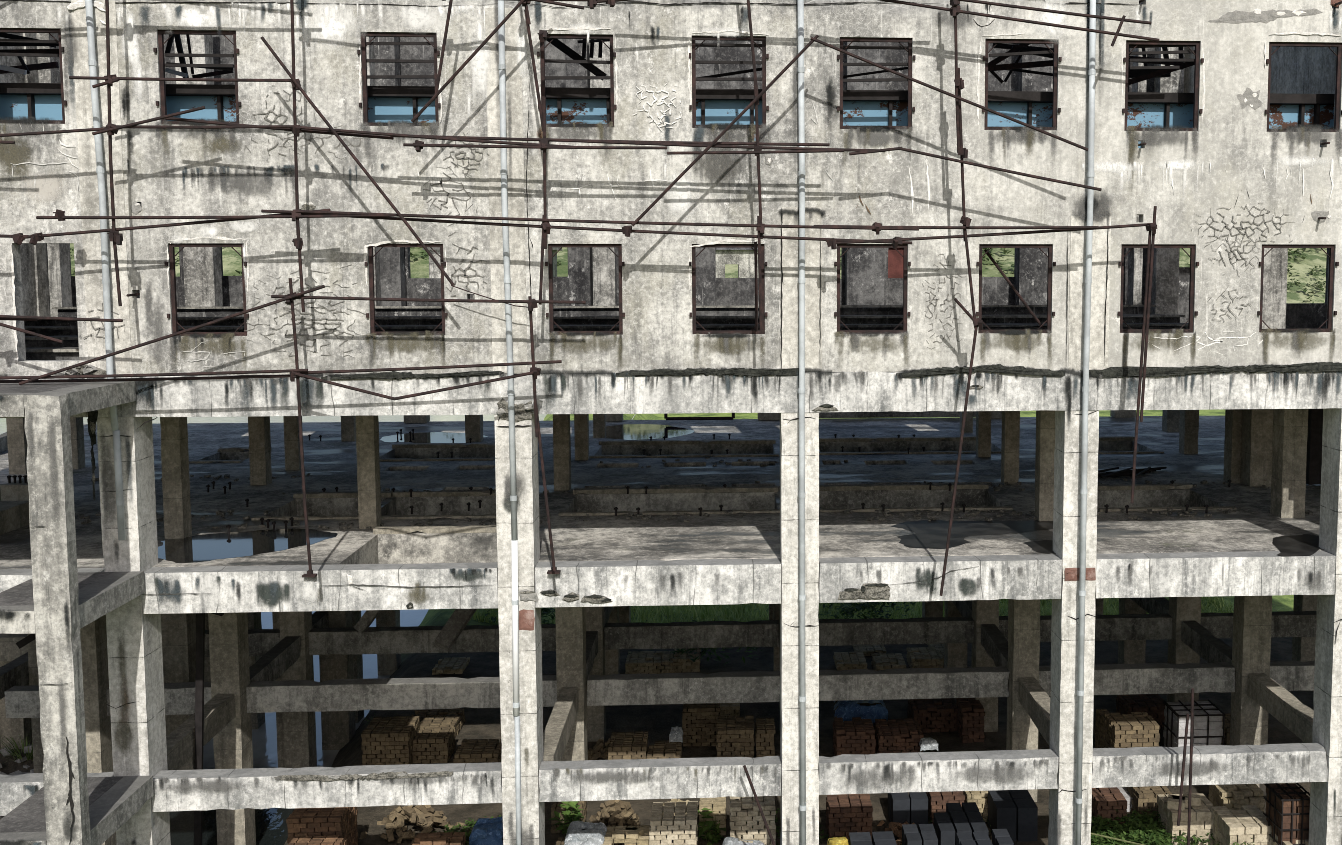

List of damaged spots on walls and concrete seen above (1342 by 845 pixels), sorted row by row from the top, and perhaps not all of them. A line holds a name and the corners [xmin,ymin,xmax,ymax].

crack [0,0,935,39]
crack [229,85,365,162]
water stain [182,165,295,194]
crack [525,85,533,298]
crack [418,134,488,303]
crack [1104,167,1334,358]
water stain [155,578,199,601]
water stain [257,581,320,606]
water stain [450,568,491,581]
water stain [917,568,937,592]
water stain [959,567,1023,595]
crack [66,737,75,845]